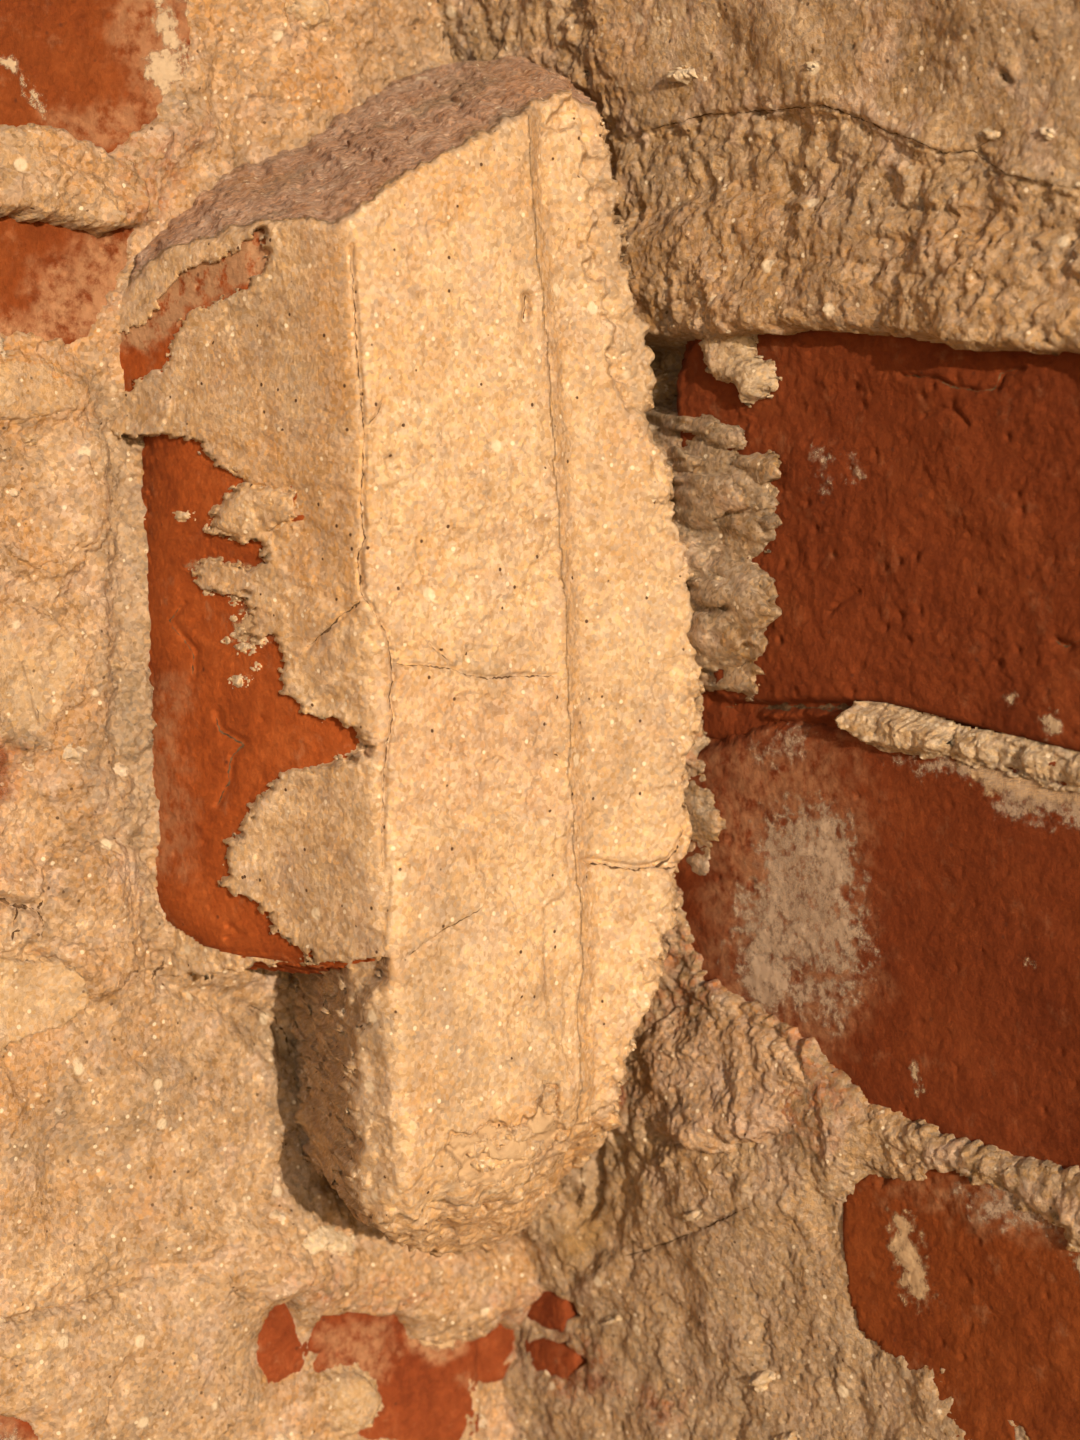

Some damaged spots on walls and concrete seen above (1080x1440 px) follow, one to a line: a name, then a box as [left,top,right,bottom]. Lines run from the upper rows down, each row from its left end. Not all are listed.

crack [629,105,1070,189]
spalling [172,482,299,541]
spalling [190,557,275,689]
efflorescence [755,726,805,769]
efflorescence [734,793,878,1035]